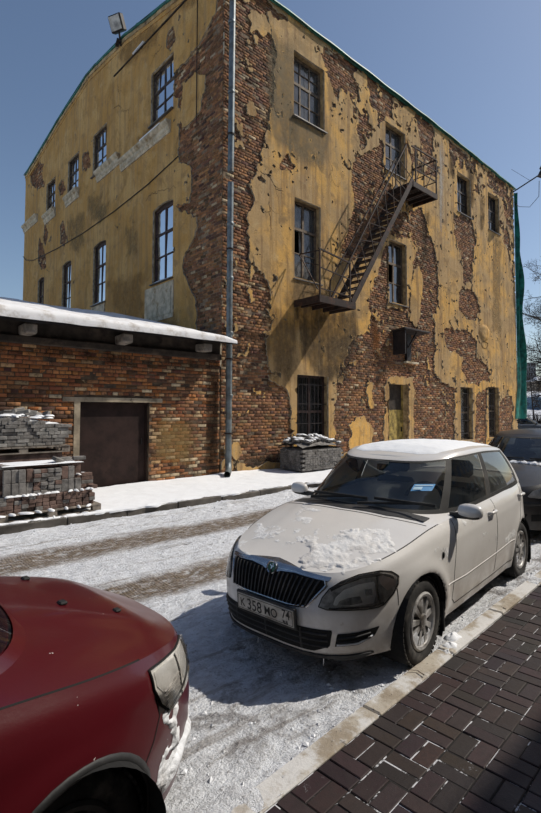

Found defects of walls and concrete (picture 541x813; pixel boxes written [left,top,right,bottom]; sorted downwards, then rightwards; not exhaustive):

spalling [31,162,45,189]
spalling [39,227,48,269]
spalling [175,0,294,473]
spalling [317,47,438,261]
spalling [449,140,514,283]
spalling [333,207,490,454]
spalling [497,394,514,432]